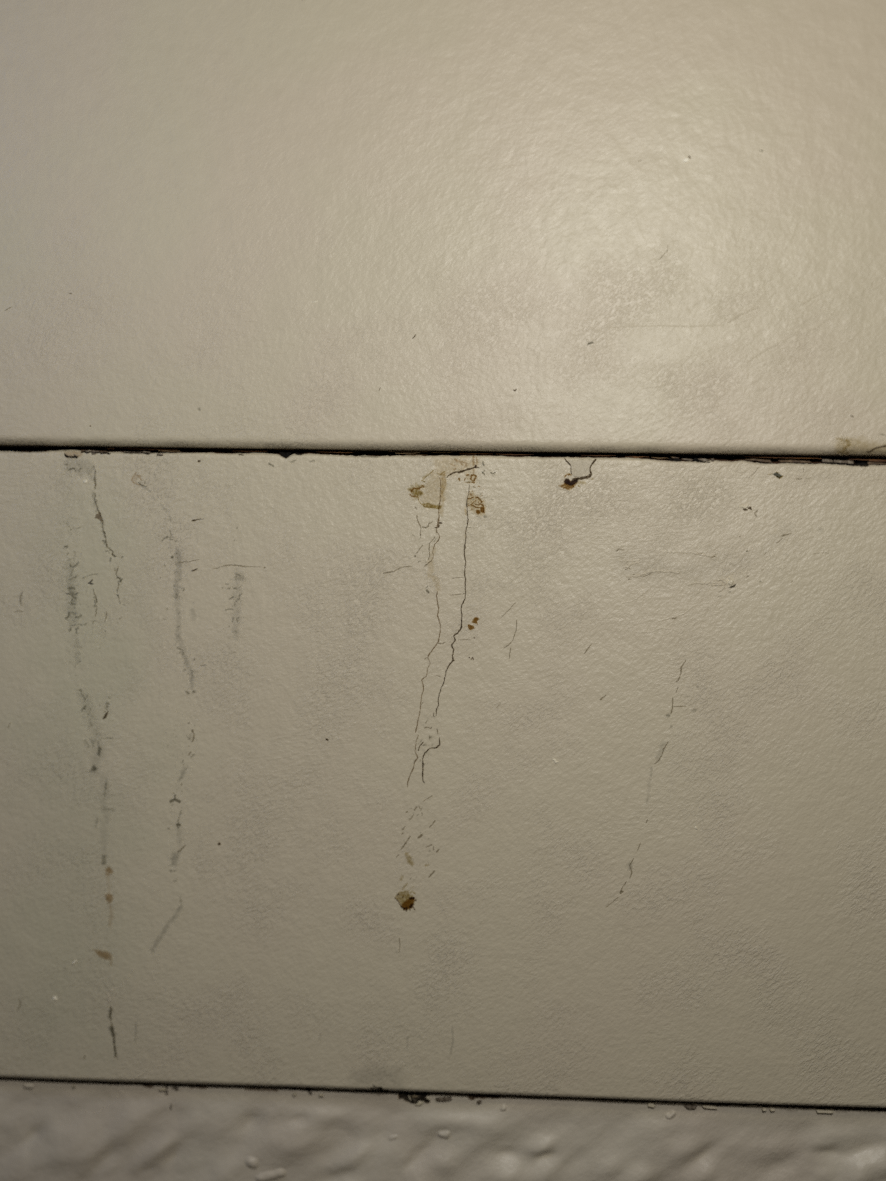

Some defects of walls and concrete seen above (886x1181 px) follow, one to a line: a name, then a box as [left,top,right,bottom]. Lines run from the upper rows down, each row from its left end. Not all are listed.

crack [407,465,479,786]